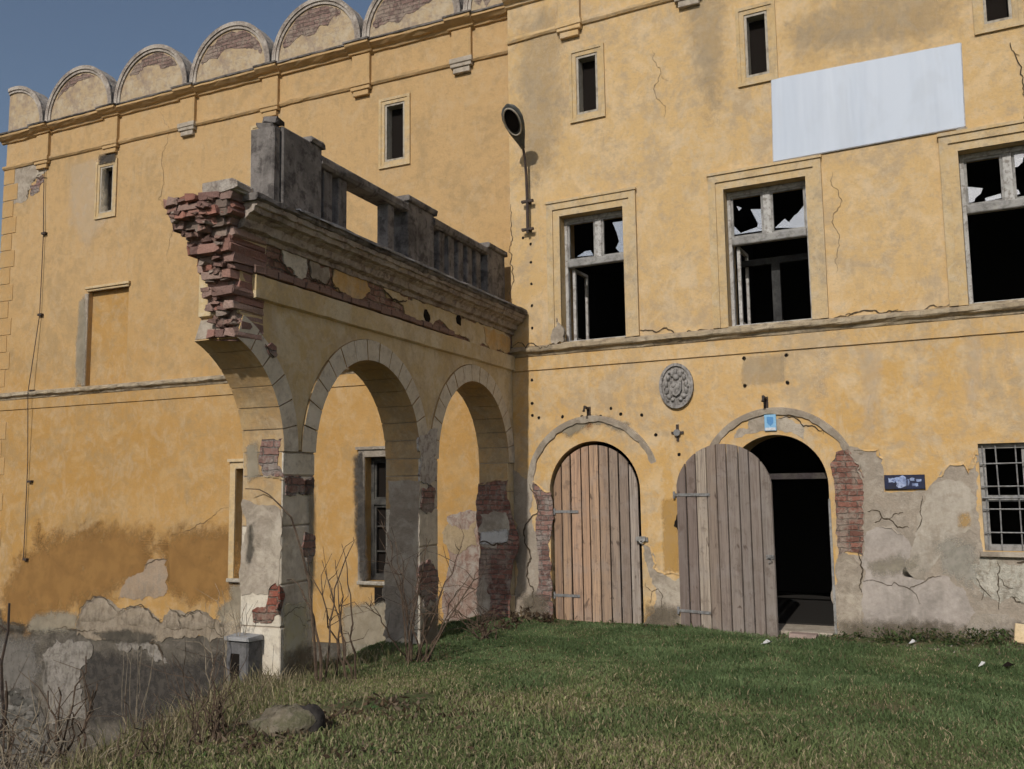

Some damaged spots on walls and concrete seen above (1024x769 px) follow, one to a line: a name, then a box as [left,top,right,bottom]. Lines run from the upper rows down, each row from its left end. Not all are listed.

crack [1010,43,1024,119]
flaking render [9,165,47,204]
crack [830,178,842,271]
damp [0,523,253,690]
flaking render [252,582,285,623]
flaking render [258,438,315,496]
peeling [416,428,438,514]
flaking render [382,470,554,641]
crack [867,496,923,530]
crack [858,552,939,604]
flaking render [830,446,1024,636]
flaking render [0,558,240,769]